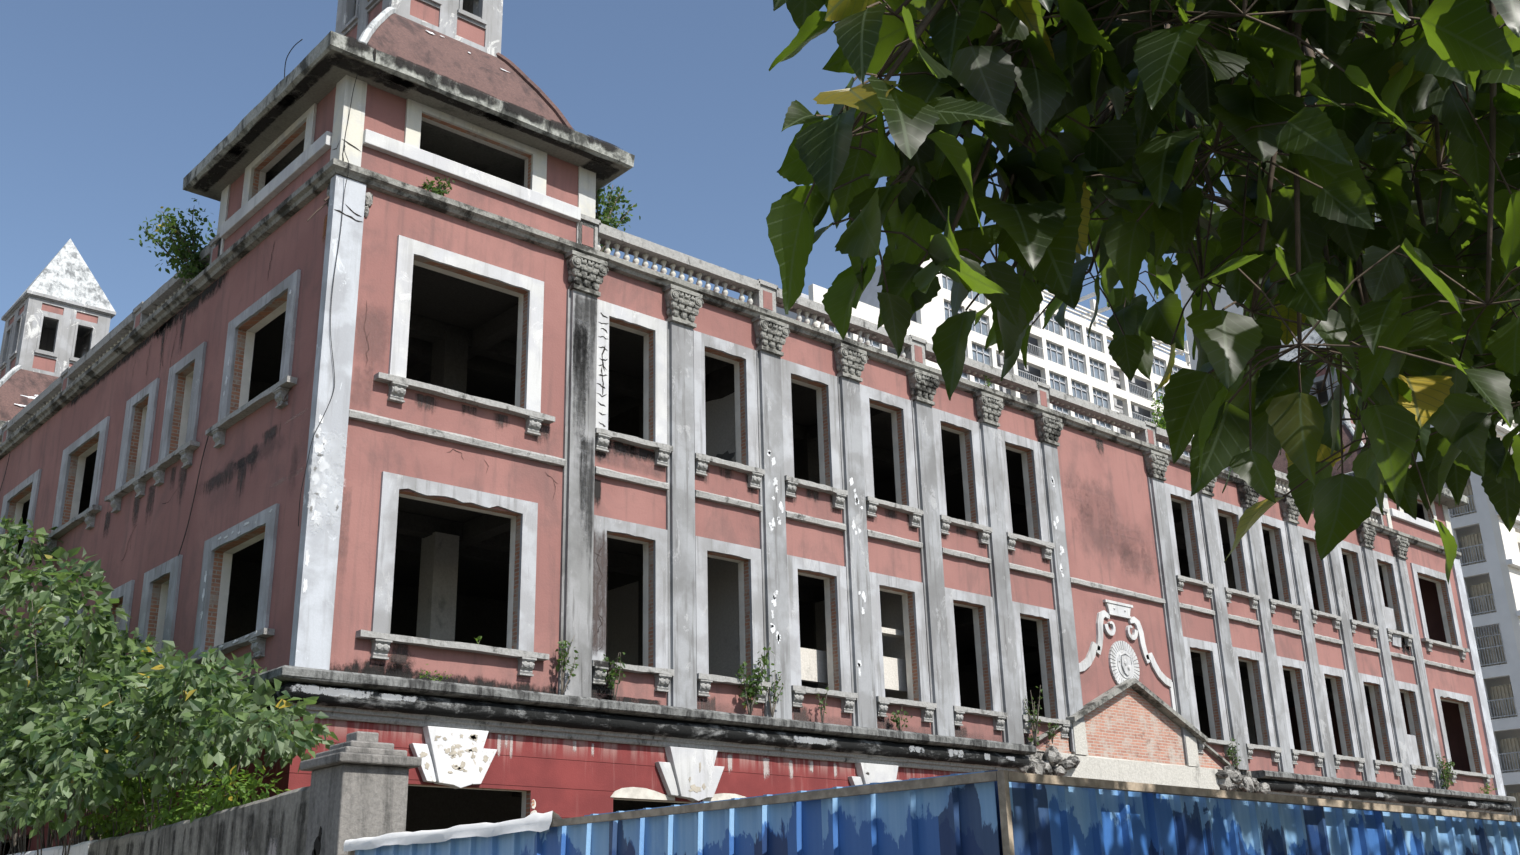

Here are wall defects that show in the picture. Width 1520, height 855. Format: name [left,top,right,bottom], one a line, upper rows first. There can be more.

water stain [133,468,187,523]
water stain [204,425,277,493]
peeling [310,414,339,526]
peeling [767,450,784,532]
peeling [770,590,781,644]
water stain [497,734,513,756]
water stain [591,660,659,705]
water stain [698,697,716,711]
water stain [792,708,809,721]
water stain [954,726,967,738]